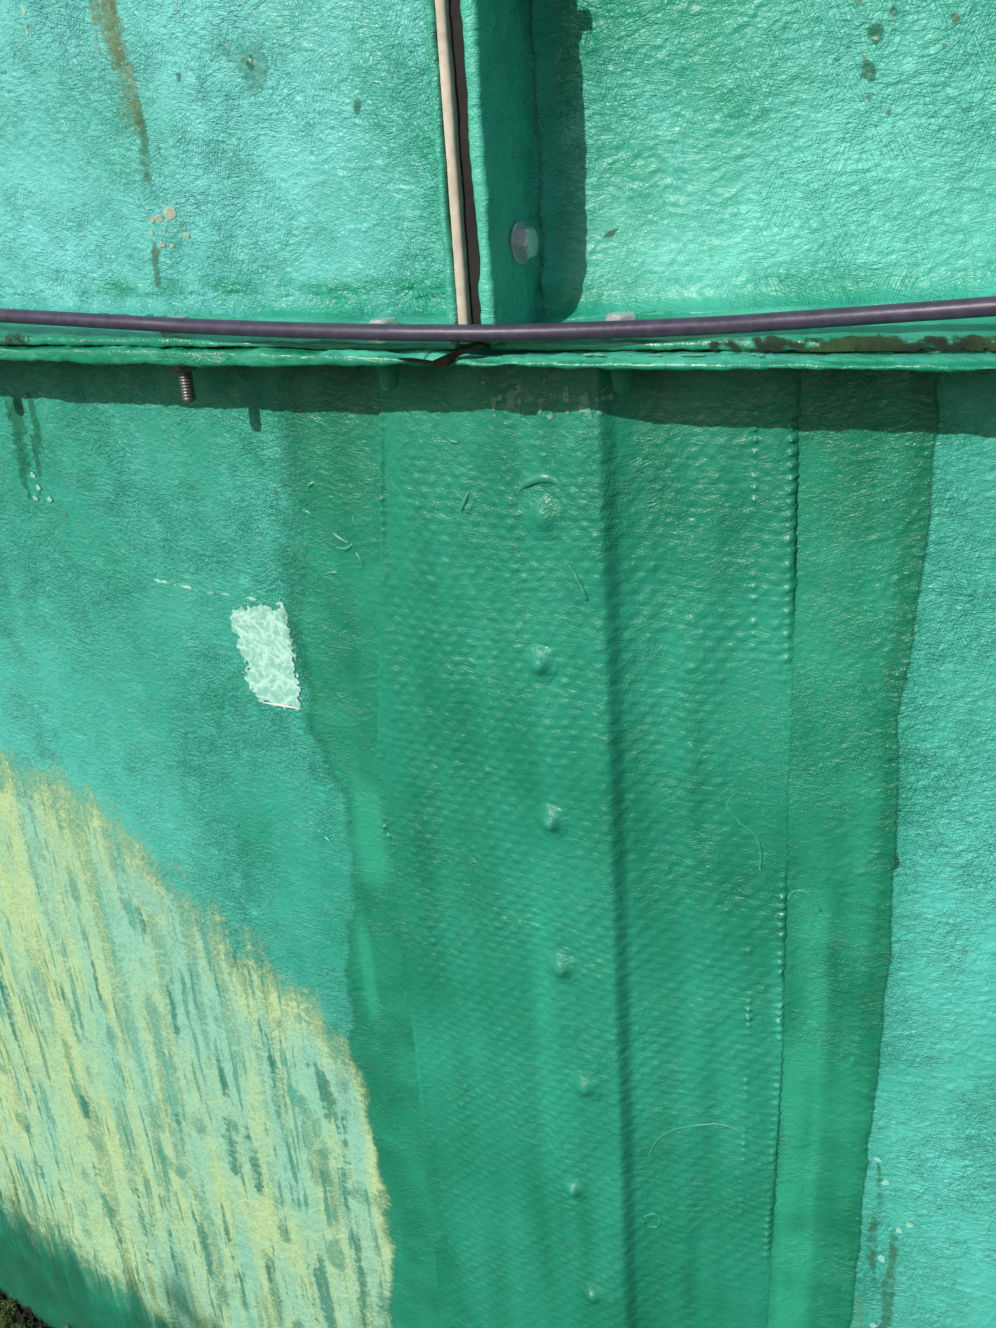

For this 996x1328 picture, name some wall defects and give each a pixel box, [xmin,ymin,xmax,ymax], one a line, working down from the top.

rust [90,0,149,181]
rust [148,201,189,287]
peeling [230,602,303,710]